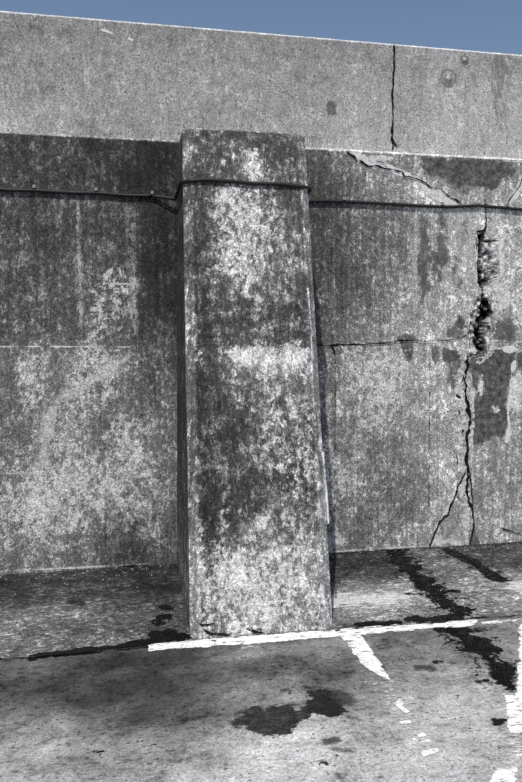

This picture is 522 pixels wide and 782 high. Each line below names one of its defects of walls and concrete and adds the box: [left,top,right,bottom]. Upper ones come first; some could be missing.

crack [347,45,461,205]
crack [316,331,522,554]
damp [335,204,522,444]
spalling [450,230,519,472]
crack [486,316,522,350]
damp [502,577,522,595]